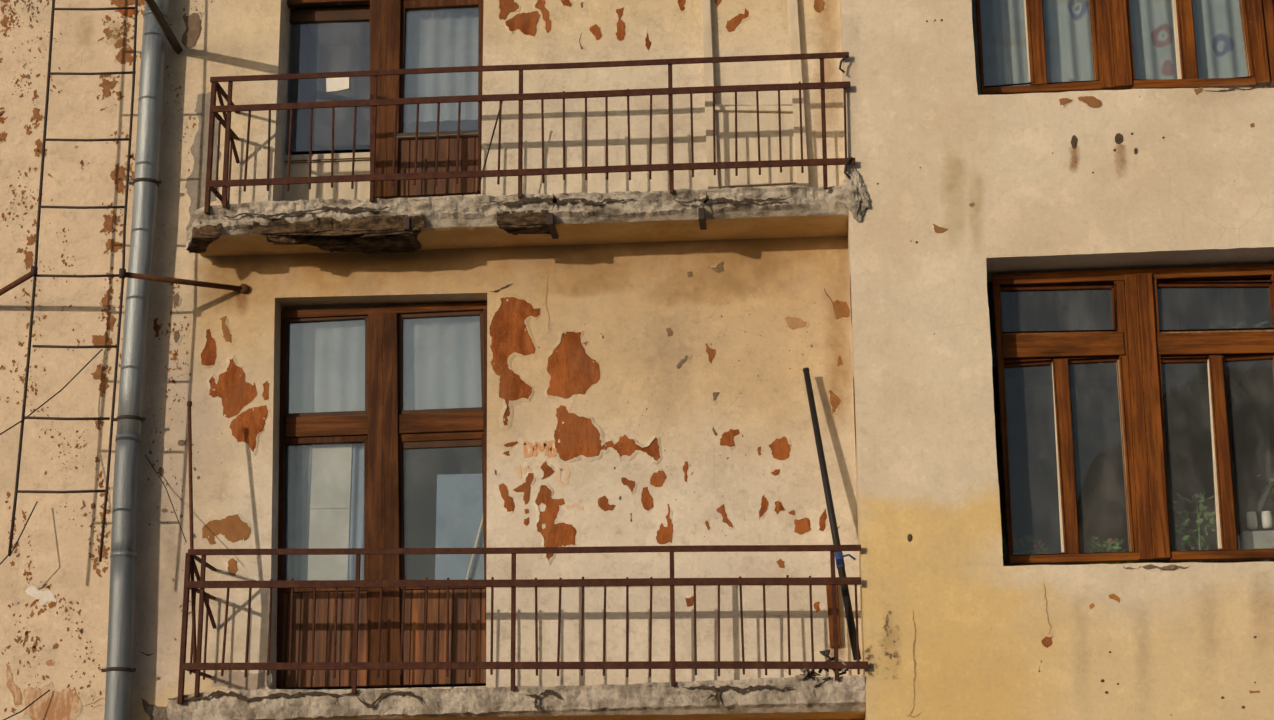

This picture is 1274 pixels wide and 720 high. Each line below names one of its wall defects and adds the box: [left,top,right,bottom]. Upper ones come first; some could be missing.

peeling [498,0,551,36]
crack [1205,84,1273,92]
spalling [186,222,222,254]
spalling [253,214,424,254]
peeling [0,0,110,577]
peeling [67,131,136,397]
peeling [148,283,269,545]
peeling [489,294,676,566]
peeling [706,427,792,476]
damp [856,611,897,676]
crack [526,690,561,711]
crack [683,685,793,705]